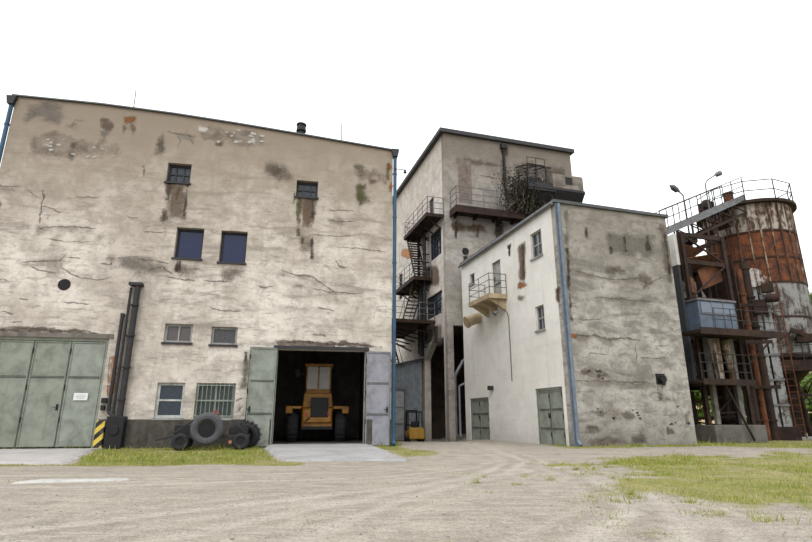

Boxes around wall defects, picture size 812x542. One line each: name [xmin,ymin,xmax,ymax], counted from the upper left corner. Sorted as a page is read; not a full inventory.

flaking render [31,132,118,158]
flaking render [198,126,265,145]
damp [162,183,189,221]
damp [267,165,288,180]
damp [355,165,375,205]
damp [294,194,316,259]
corrosion [707,231,806,282]